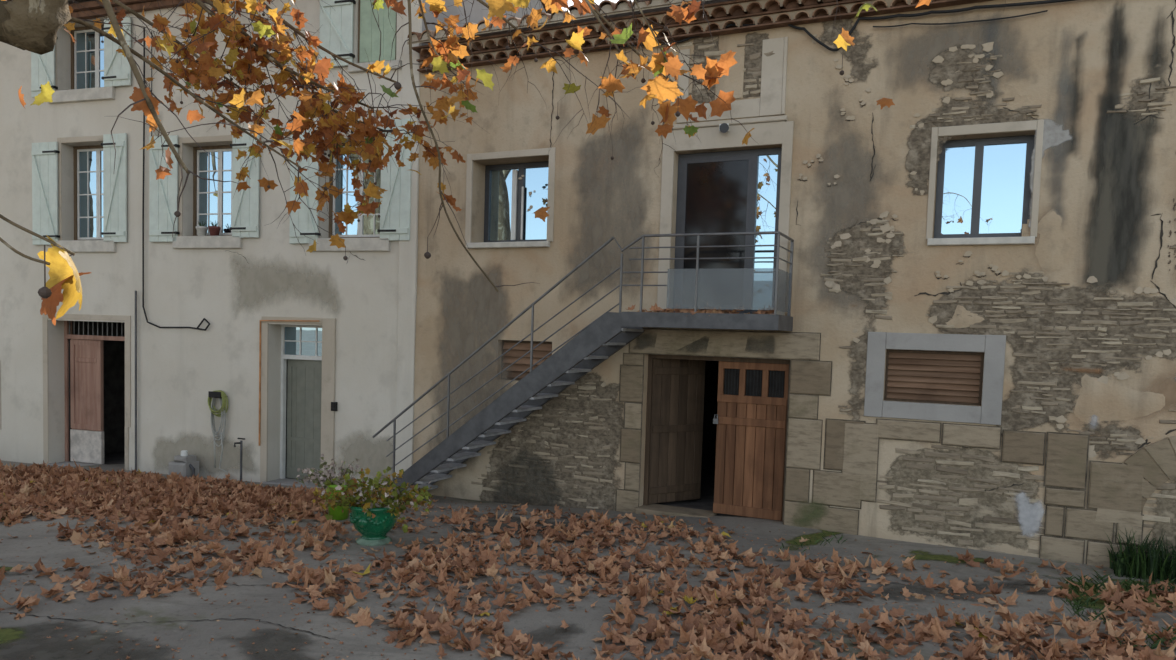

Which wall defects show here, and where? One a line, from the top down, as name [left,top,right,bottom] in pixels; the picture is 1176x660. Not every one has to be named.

flaking render [905,42,1042,196]
water stain [1085,17,1157,287]
water stain [1149,24,1165,82]
flaking render [821,211,913,421]
flaking render [925,251,1176,458]